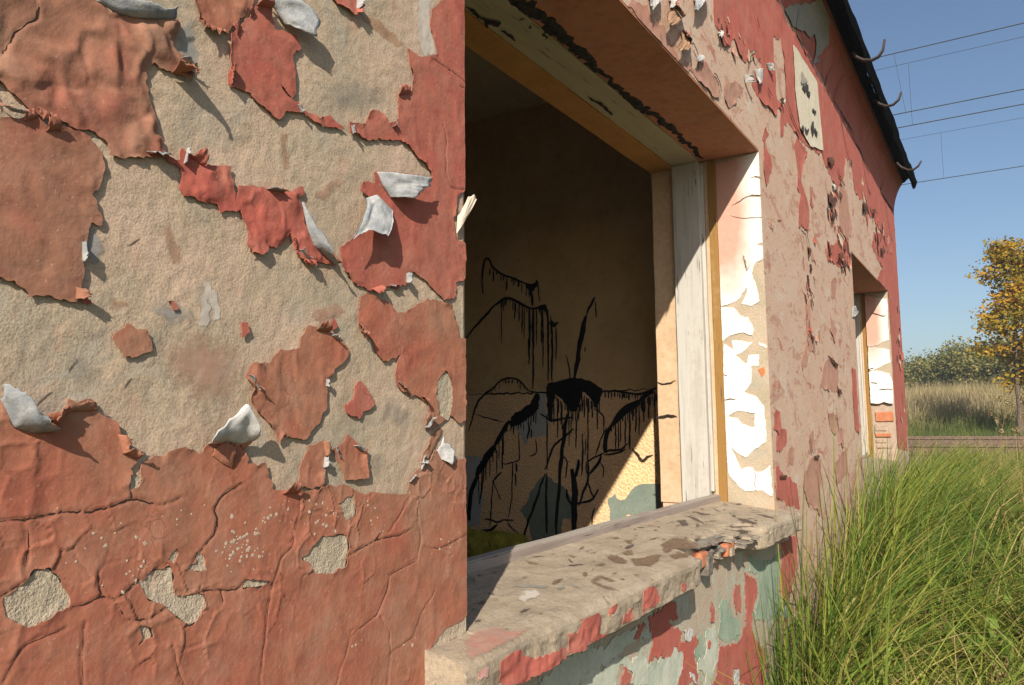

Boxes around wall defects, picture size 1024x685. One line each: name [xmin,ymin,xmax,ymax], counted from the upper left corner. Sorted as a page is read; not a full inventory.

peeling [628,0,908,515]
peeling [0,0,483,685]
crack [0,491,178,596]
crack [73,574,244,621]
crack [196,482,241,557]
crack [337,502,458,680]
peeling [478,529,798,685]